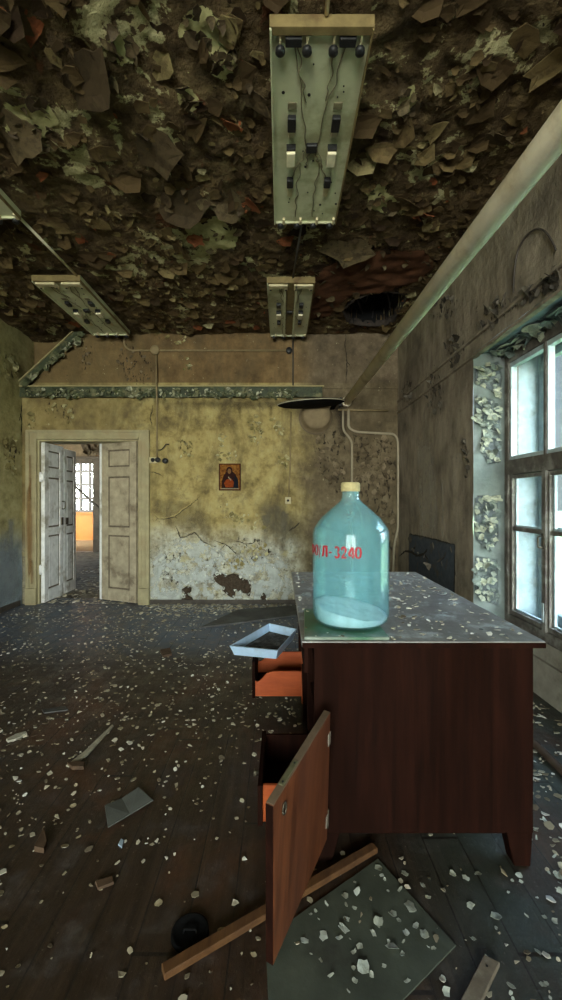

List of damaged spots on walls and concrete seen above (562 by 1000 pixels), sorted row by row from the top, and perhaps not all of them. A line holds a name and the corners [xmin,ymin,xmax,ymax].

peeling [0,0,562,429]
spalling [159,501,271,600]
peeling [471,495,503,605]